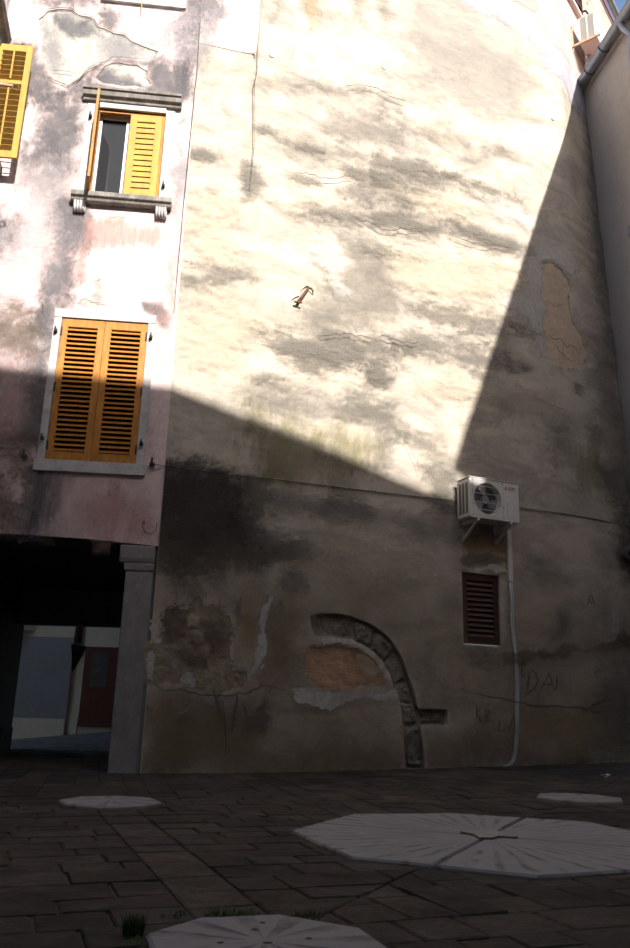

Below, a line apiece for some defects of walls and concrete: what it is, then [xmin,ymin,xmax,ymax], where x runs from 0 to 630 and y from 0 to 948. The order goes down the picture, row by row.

spalling [39,10,158,89]
peeling [557,0,587,63]
water stain [0,0,224,537]
spalling [390,242,586,372]
water stain [157,455,371,595]
spalling [143,596,247,695]
water stain [251,571,309,681]
water stain [321,637,368,649]
spalling [302,642,388,693]